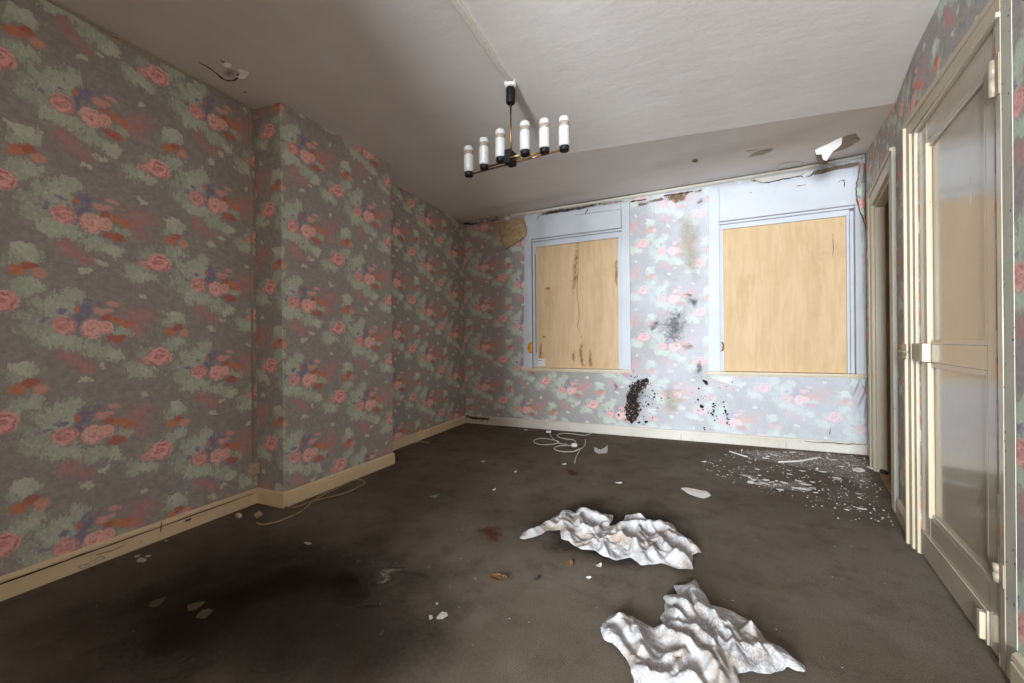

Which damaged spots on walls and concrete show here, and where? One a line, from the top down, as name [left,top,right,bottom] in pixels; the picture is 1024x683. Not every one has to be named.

peeling [814,134,862,187]
damp [617,375,662,425]